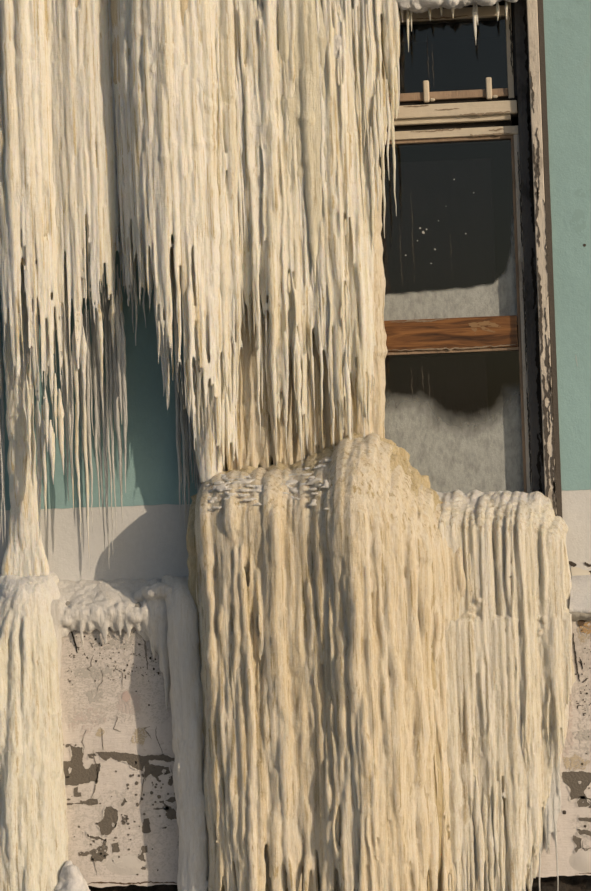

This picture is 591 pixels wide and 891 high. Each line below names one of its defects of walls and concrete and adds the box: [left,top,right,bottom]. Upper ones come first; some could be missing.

peeling [63,744,179,882]
peeling [560,626,591,853]